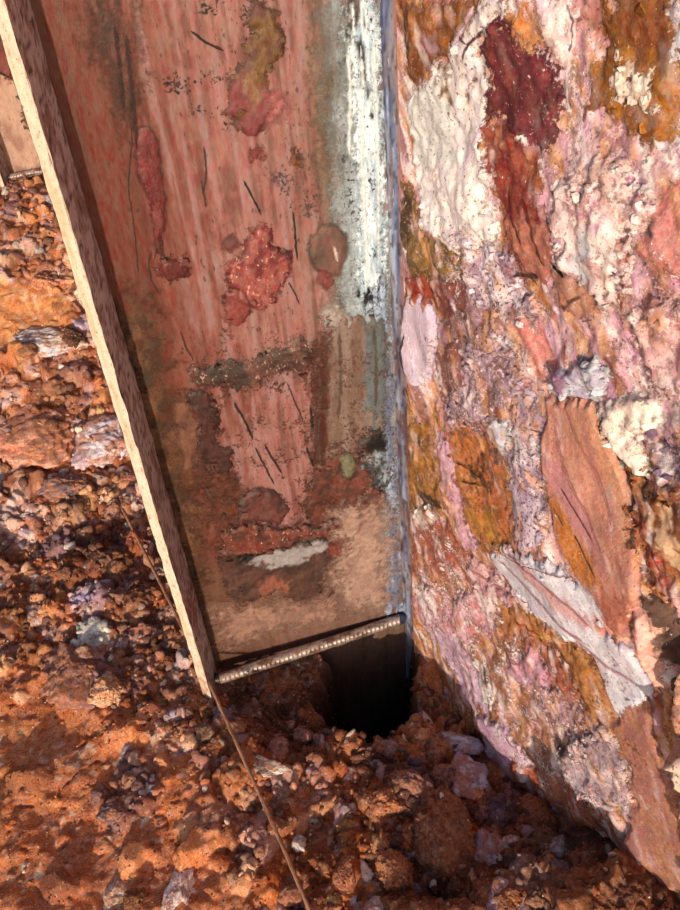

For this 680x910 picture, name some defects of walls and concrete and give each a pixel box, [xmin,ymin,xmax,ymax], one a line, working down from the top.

peeling [221,0,288,136]
rust [134,126,192,282]
peeling [220,222,293,313]
leakage [115,0,680,822]
spalling [237,487,290,527]
spalling [218,534,338,606]